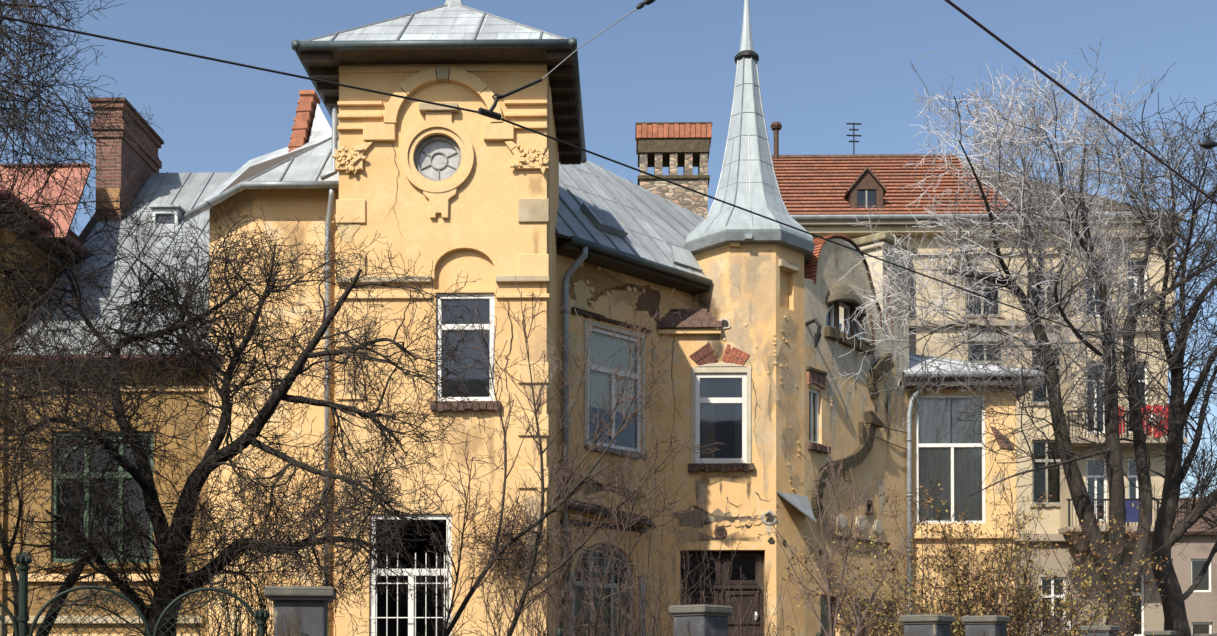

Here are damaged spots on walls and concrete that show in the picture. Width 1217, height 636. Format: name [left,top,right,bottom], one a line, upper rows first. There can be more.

peeling [569,262,661,322]
flaking render [689,318,750,366]
peeling [765,294,822,414]
peeling [813,323,906,431]
spalling [691,507,787,546]